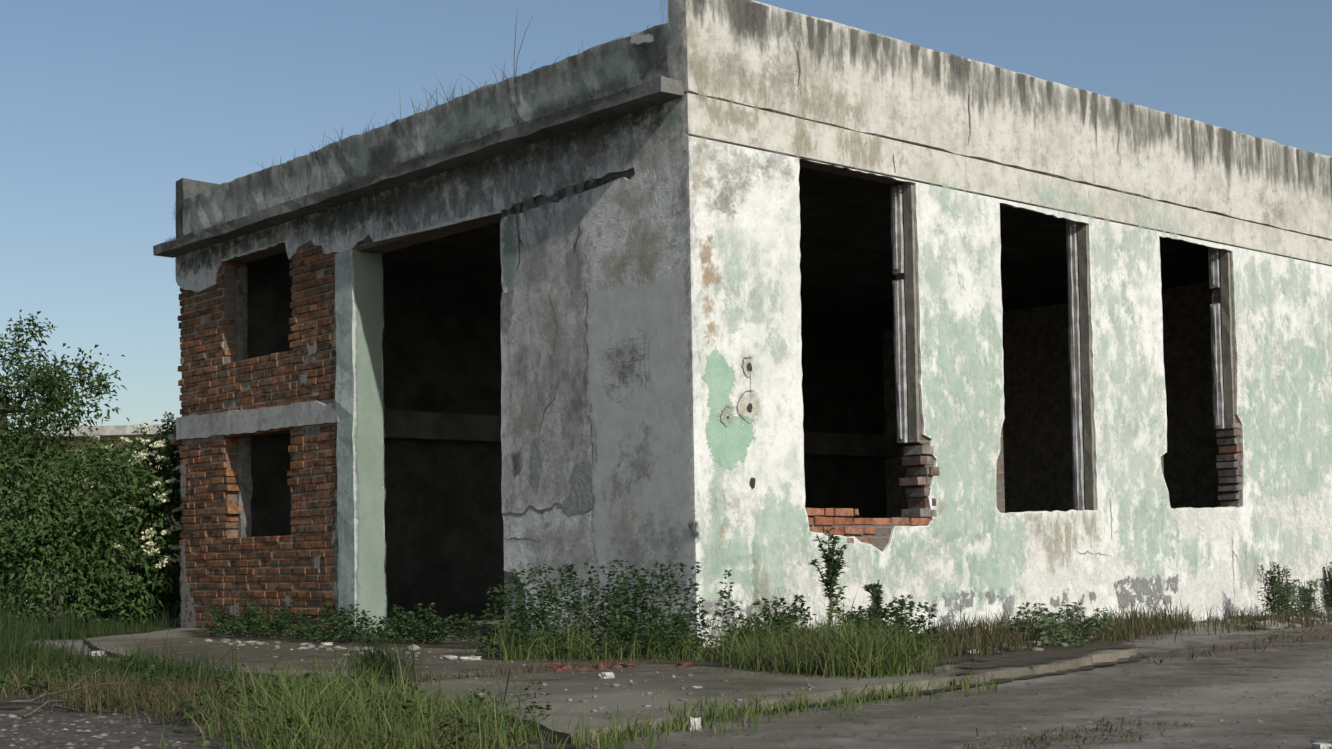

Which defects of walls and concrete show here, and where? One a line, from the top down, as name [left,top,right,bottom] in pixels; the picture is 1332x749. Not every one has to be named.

water stain [165,30,680,274]
crack [503,174,634,271]
water stain [694,123,810,212]
water stain [692,0,1332,194]
crack [502,292,595,542]
peeling [689,230,1030,639]
peeling [1206,261,1332,580]